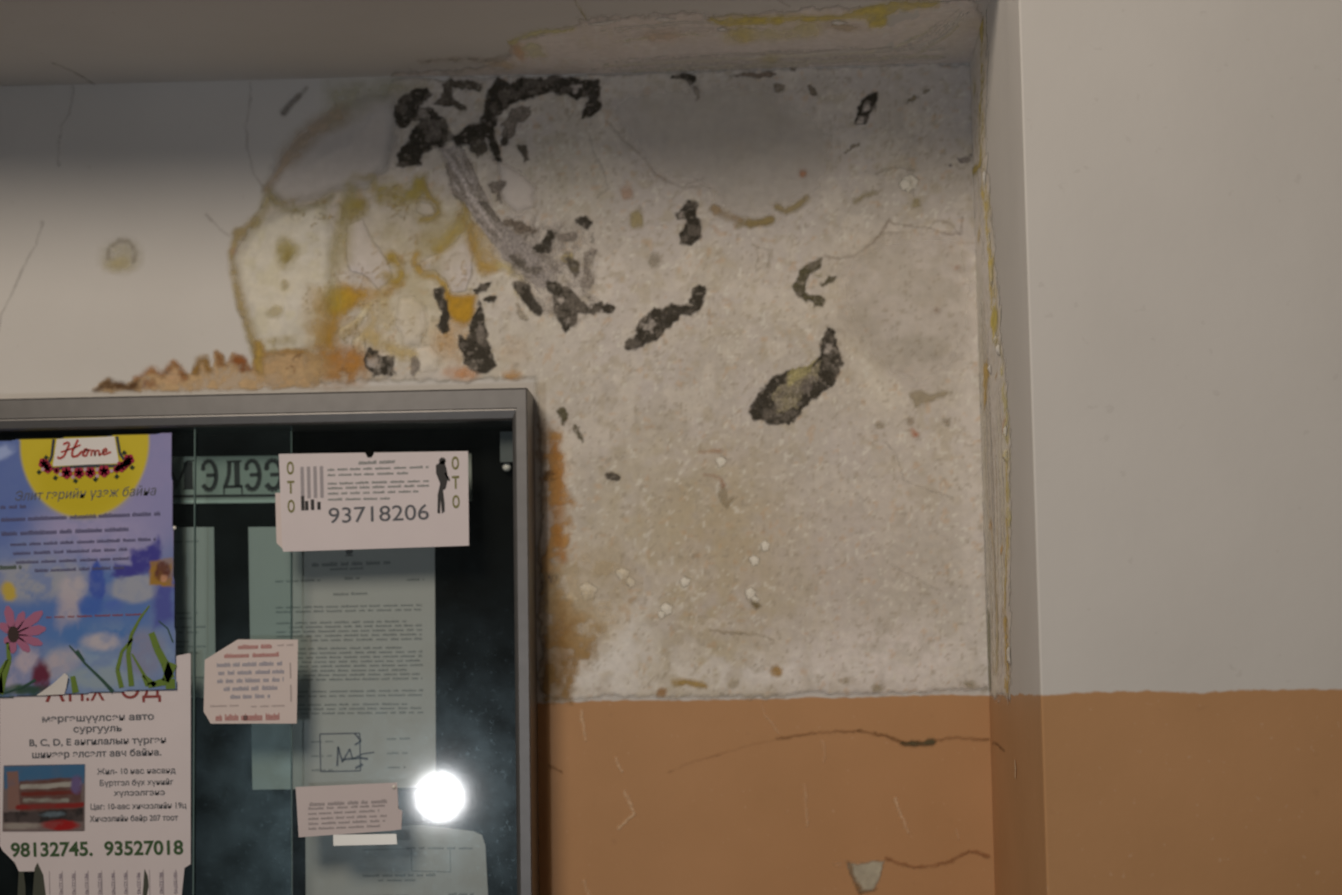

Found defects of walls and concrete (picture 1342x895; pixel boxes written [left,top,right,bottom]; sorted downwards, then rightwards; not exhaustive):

leakage [802,3,932,31]
leakage [734,67,795,92]
leakage [854,92,878,124]
leakage [230,221,256,356]
leakage [278,242,295,263]
leakage [793,258,836,306]
leakage [978,191,997,339]
peeling [234,0,1012,699]
leakage [749,327,843,425]
leakage [987,602,1008,693]
crack [859,730,935,746]
spalling [848,861,883,893]